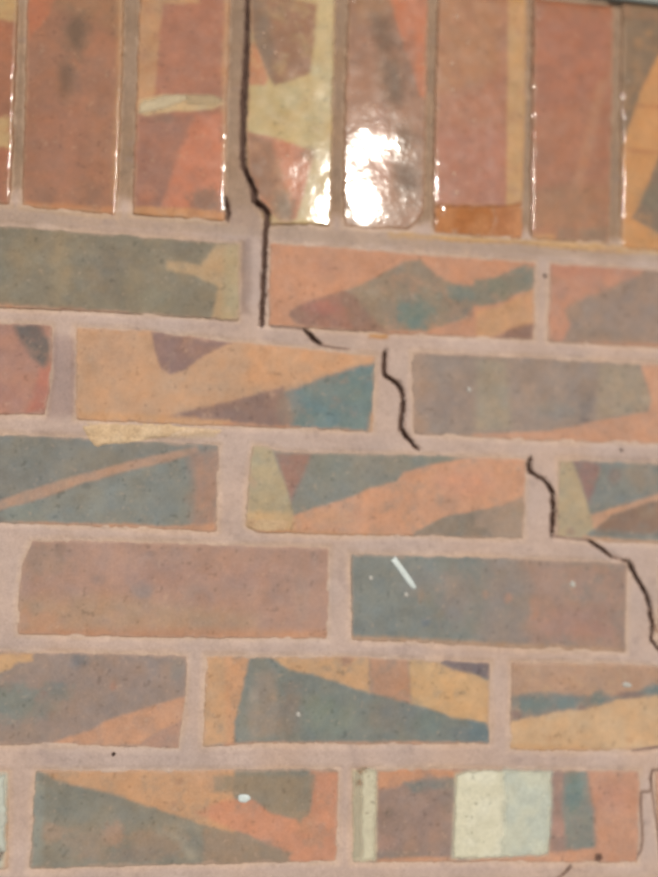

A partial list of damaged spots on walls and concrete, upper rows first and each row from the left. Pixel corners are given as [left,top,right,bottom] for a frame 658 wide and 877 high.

crack [223,0,350,350]
crack [381,351,420,452]
crack [525,457,658,651]